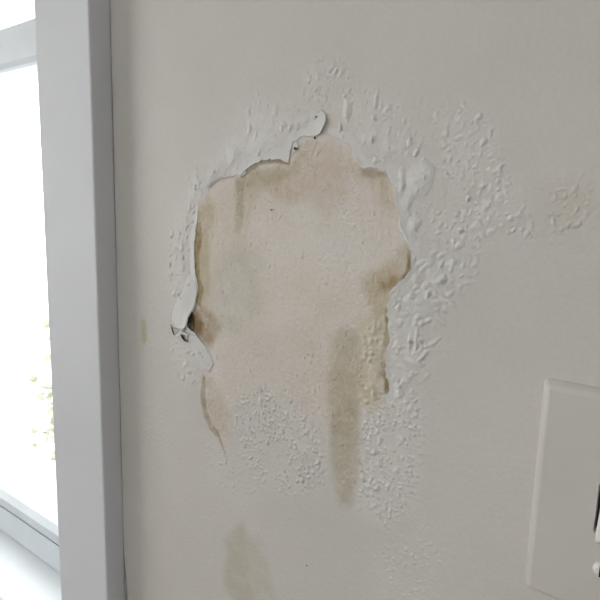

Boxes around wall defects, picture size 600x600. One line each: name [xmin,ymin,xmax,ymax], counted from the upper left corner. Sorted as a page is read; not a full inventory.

peeling [172,206,214,372]
leakage [187,61,412,511]
peeling [208,110,420,407]